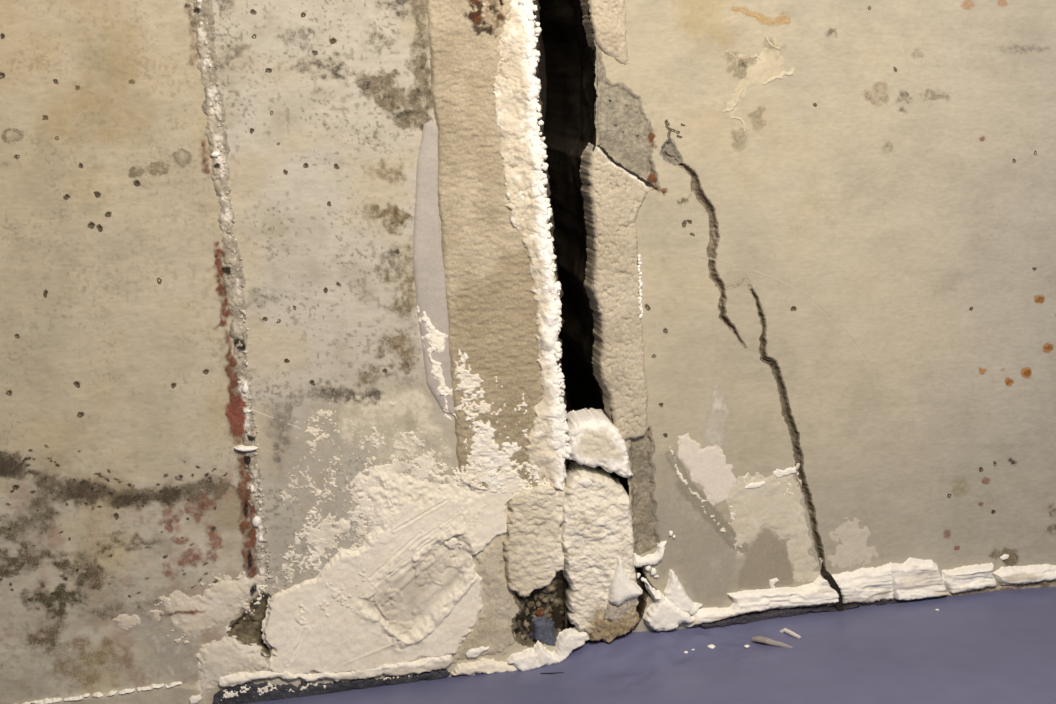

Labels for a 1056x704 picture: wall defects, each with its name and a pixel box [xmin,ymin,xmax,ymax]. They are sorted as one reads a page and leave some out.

crack [533,0,614,423]
peeling [579,40,666,556]
rust [215,242,257,578]
crack [659,120,844,611]
rust [1006,367,1031,386]
crack [564,459,629,496]
spalling [227,591,272,659]
spalling [510,570,575,647]
crack [562,573,570,629]